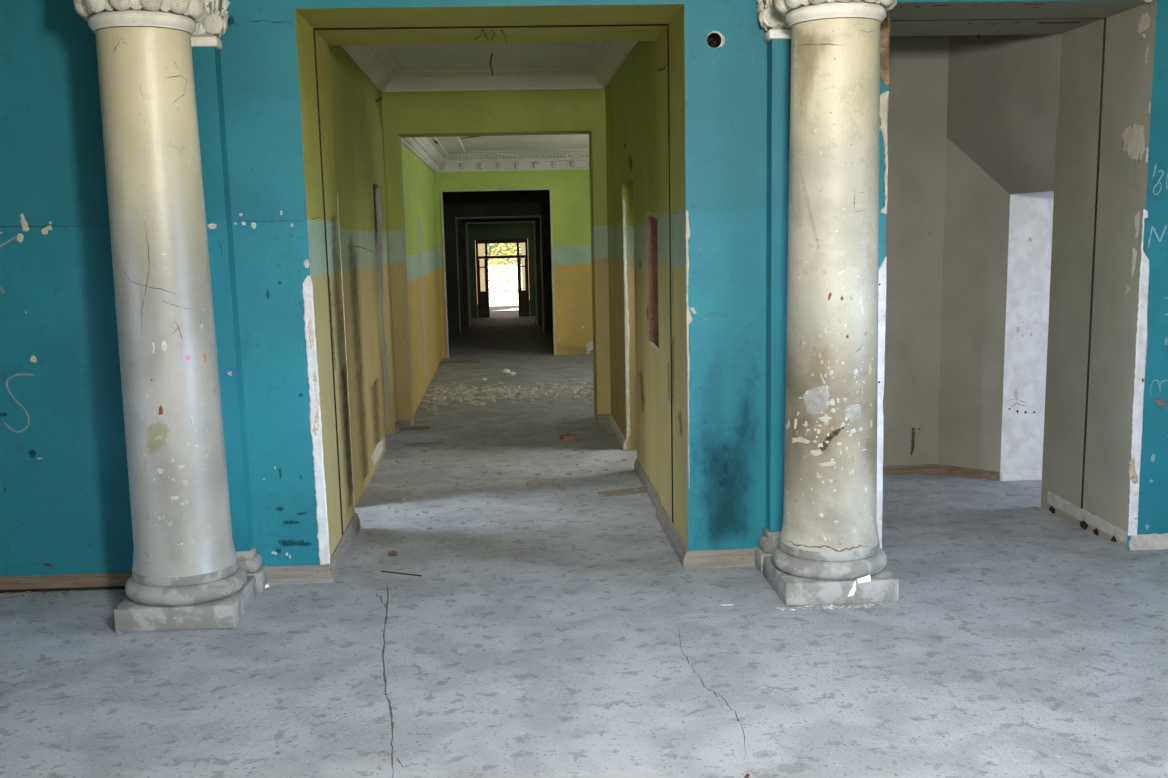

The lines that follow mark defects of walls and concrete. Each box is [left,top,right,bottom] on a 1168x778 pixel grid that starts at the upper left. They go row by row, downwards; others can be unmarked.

spalling [785,257,887,549]
crack [376,584,413,772]
crack [679,630,746,753]